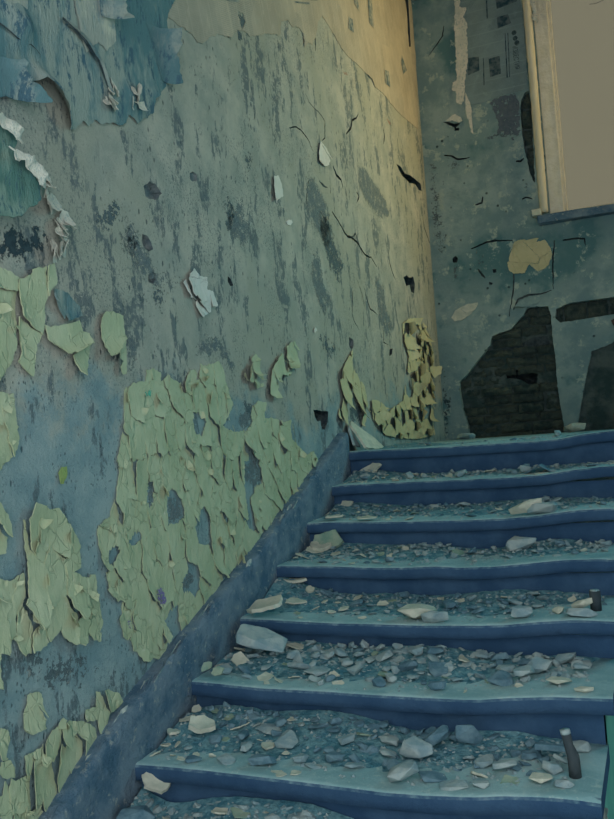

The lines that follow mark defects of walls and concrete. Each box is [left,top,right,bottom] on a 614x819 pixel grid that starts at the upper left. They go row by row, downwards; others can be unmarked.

crack [289,95,325,148]
crack [306,166,359,202]
peeling [0,263,128,380]
peeling [183,268,218,317]
crack [332,212,395,278]
peeling [507,238,552,274]
crack [509,237,586,316]
peeling [338,318,442,439]
flaking render [459,297,614,438]
peeling [0,341,319,696]
flaking render [246,585,362,619]
peeling [0,689,128,819]